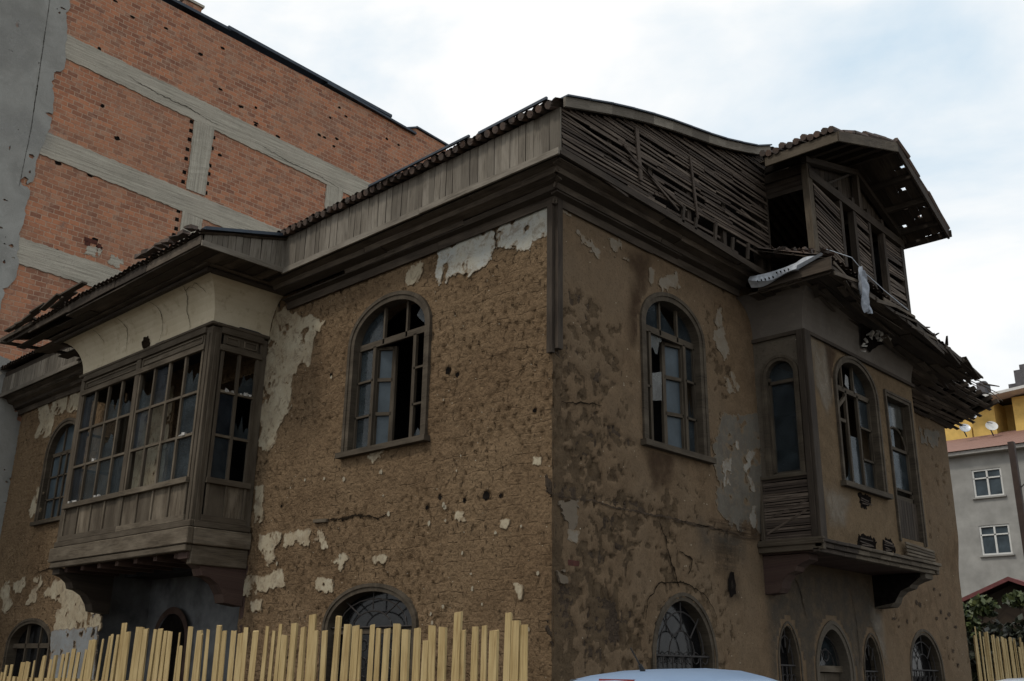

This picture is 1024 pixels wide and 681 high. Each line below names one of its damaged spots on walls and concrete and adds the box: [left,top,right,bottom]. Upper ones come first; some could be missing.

spalling [564,124,754,263]
spalling [84,237,124,268]
peeling [722,440,756,492]
crack [328,512,393,521]
crack [552,492,761,617]